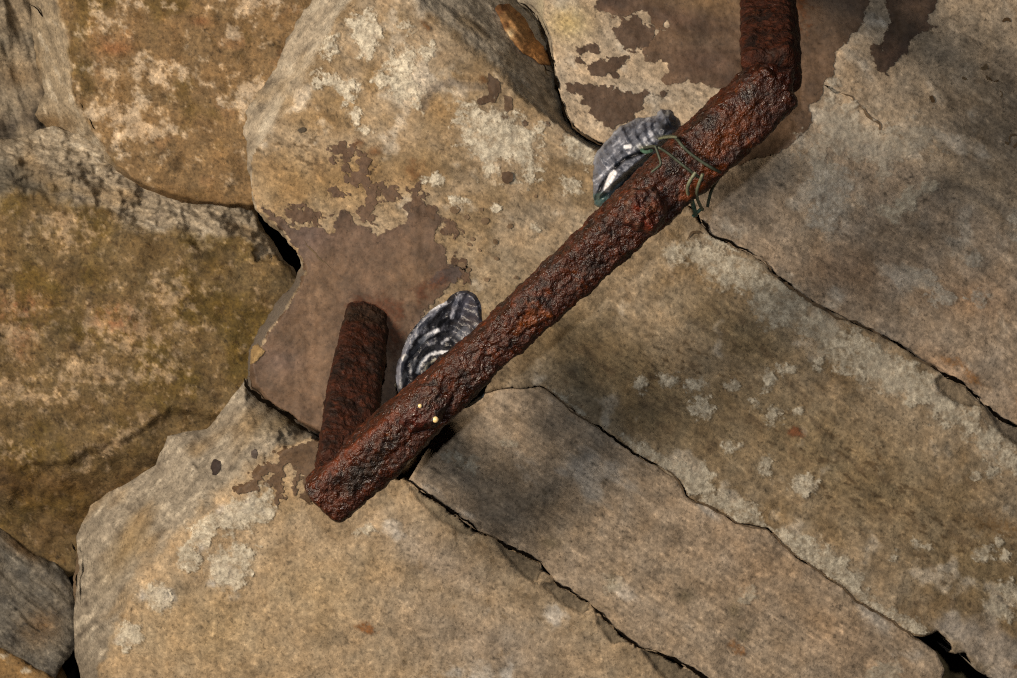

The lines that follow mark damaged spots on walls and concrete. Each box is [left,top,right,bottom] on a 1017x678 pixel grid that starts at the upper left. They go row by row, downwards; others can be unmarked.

leakage [451,73,550,198]
leakage [562,177,584,196]
leakage [564,132,595,171]
leakage [565,0,742,129]
leakage [738,0,944,233]
crack [687,219,1017,426]
crack [404,479,707,678]
crack [548,390,921,641]